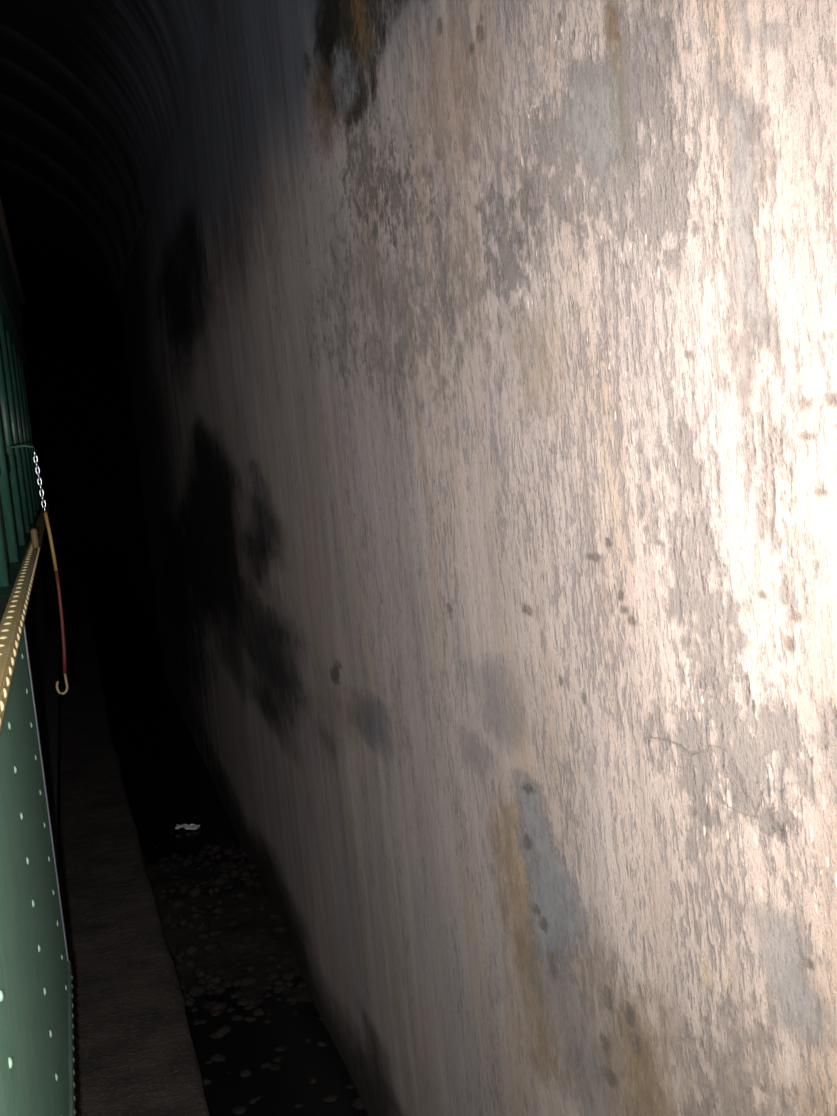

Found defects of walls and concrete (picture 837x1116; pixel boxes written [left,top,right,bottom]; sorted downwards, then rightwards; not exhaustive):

leakage [306,0,407,145]
leakage [163,422,298,728]